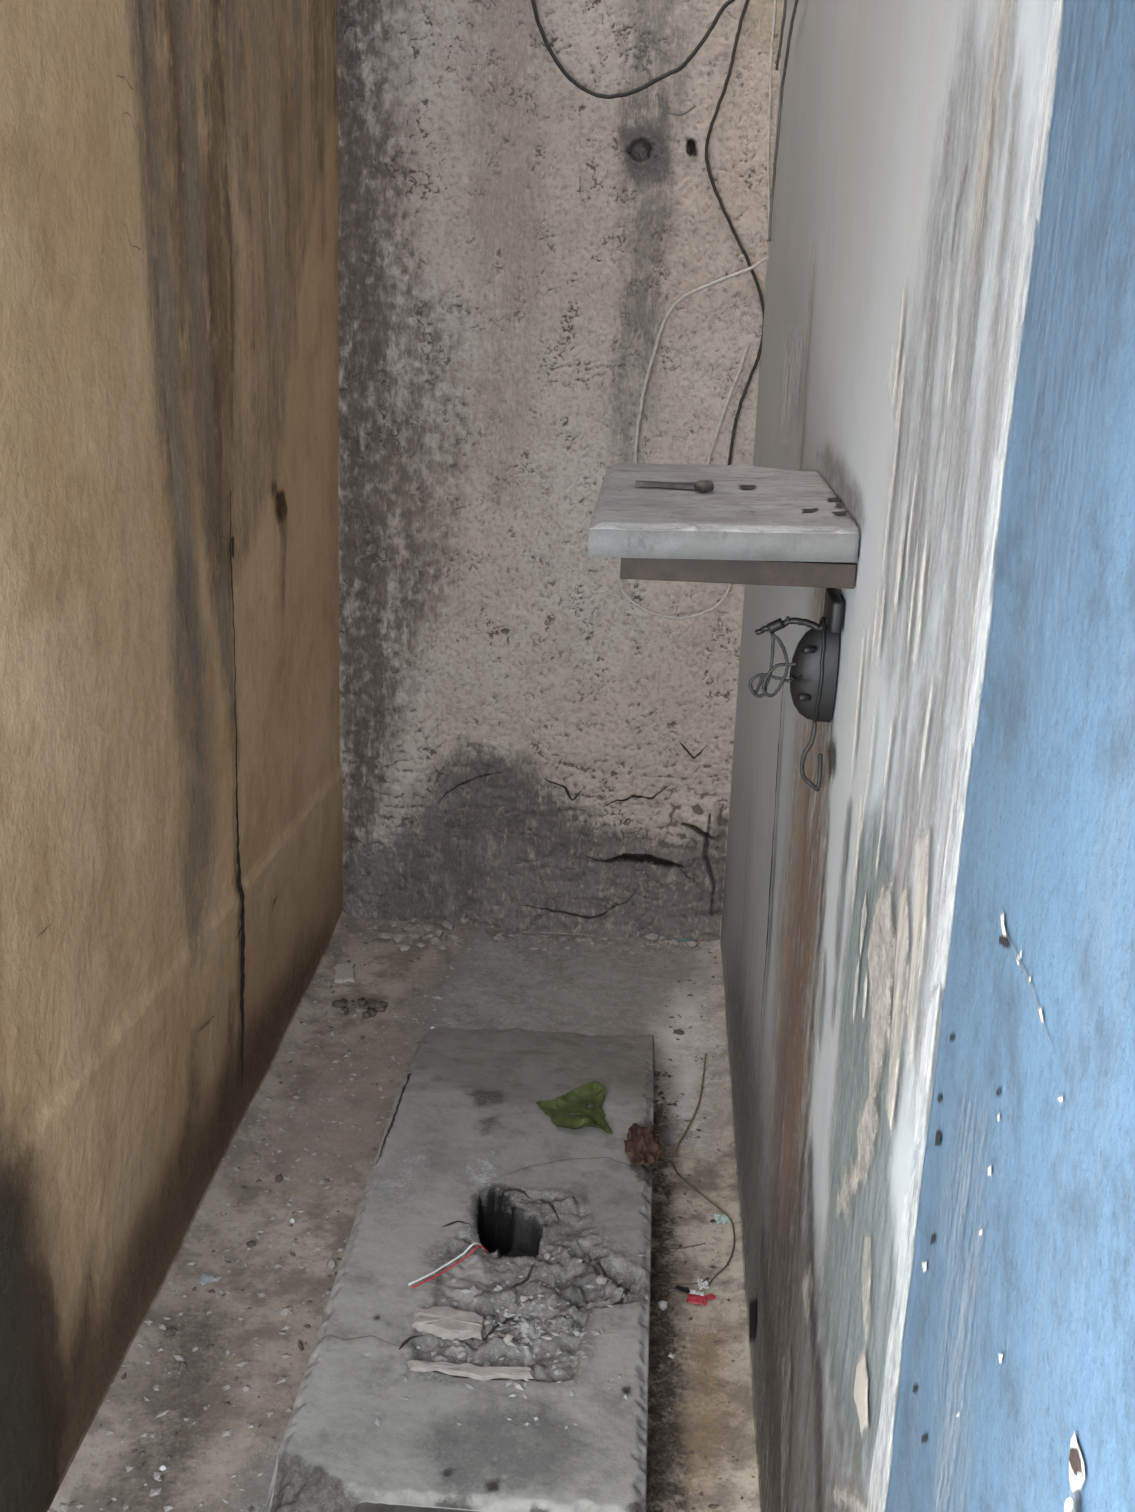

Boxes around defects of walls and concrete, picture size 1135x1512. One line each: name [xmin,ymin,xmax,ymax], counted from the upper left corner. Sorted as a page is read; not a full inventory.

water stain [132,0,732,1153]
crack [230,490,245,1086]
peeling [834,0,1063,1512]
peeling [814,952,823,1048]
water stain [0,958,315,1512]
water stain [464,1090,502,1187]
spalling [399,1188,649,1382]
spalling [270,1453,358,1512]
peeling [781,1346,791,1512]
spalling [1069,1432,1085,1512]